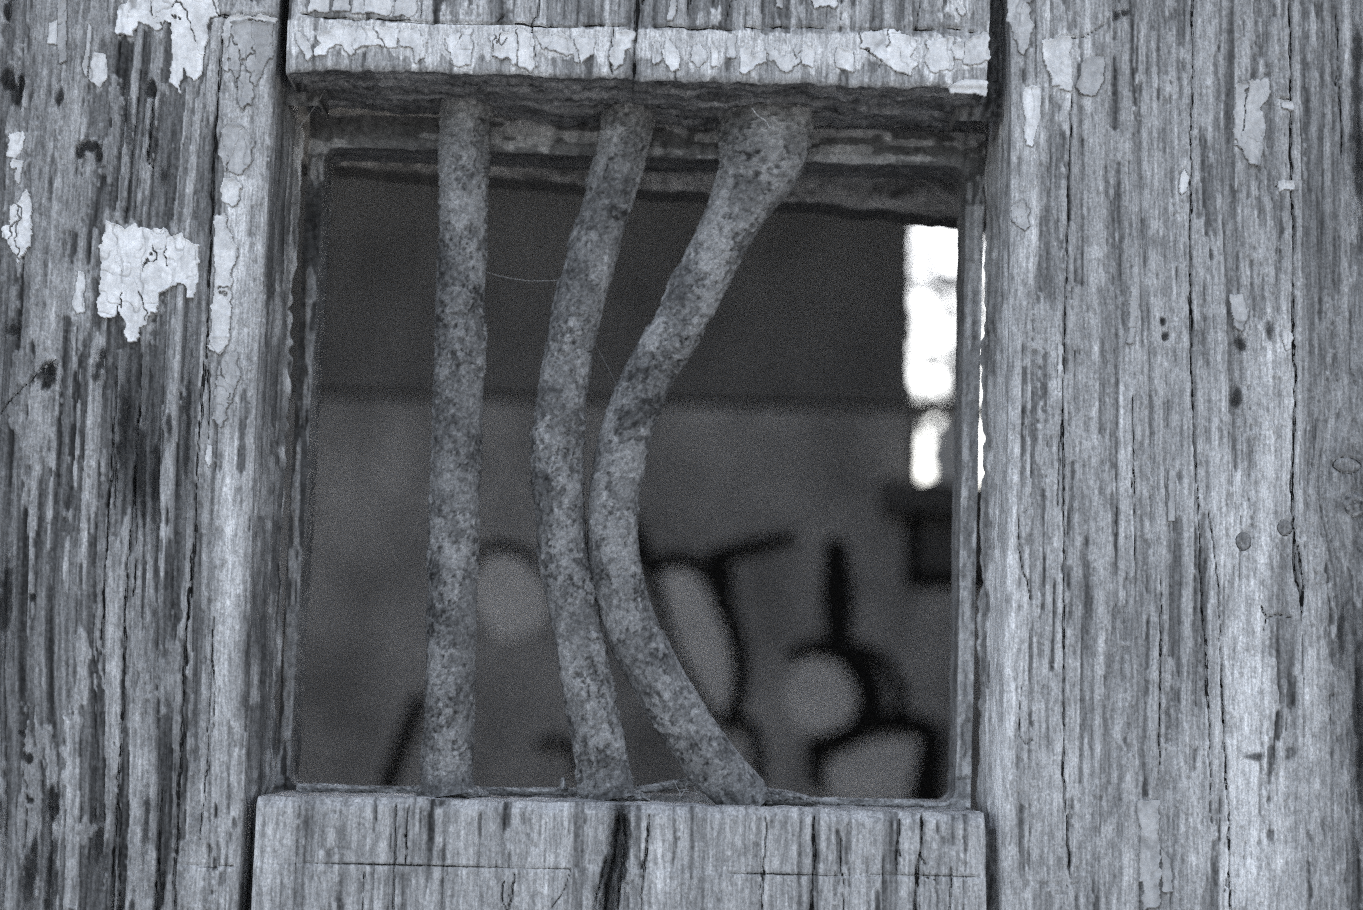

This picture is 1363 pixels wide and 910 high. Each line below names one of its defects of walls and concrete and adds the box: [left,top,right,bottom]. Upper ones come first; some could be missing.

peeling [1,131,33,264]
peeling [72,0,278,427]
peeling [296,0,428,64]
crack [304,0,822,83]
peeling [835,29,991,97]
peeling [1006,0,1105,147]
peeling [1232,78,1294,167]
crack [100,369,142,908]
crack [155,0,271,907]
crack [1057,98,1072,870]
crack [1188,0,1231,909]
crack [1261,283,1304,631]